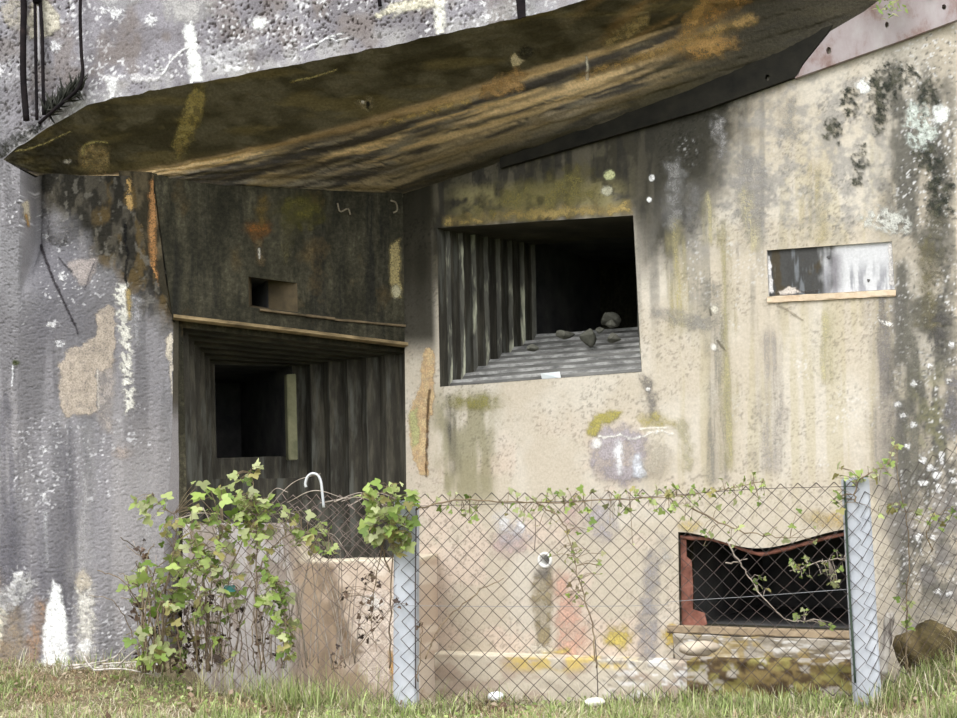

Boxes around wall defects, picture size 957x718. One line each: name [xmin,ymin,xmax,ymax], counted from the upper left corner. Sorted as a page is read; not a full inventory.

flaking render [58,305,116,431]
leakage [878,297,891,395]
leakage [903,311,919,508]
leakage [0,474,36,637]